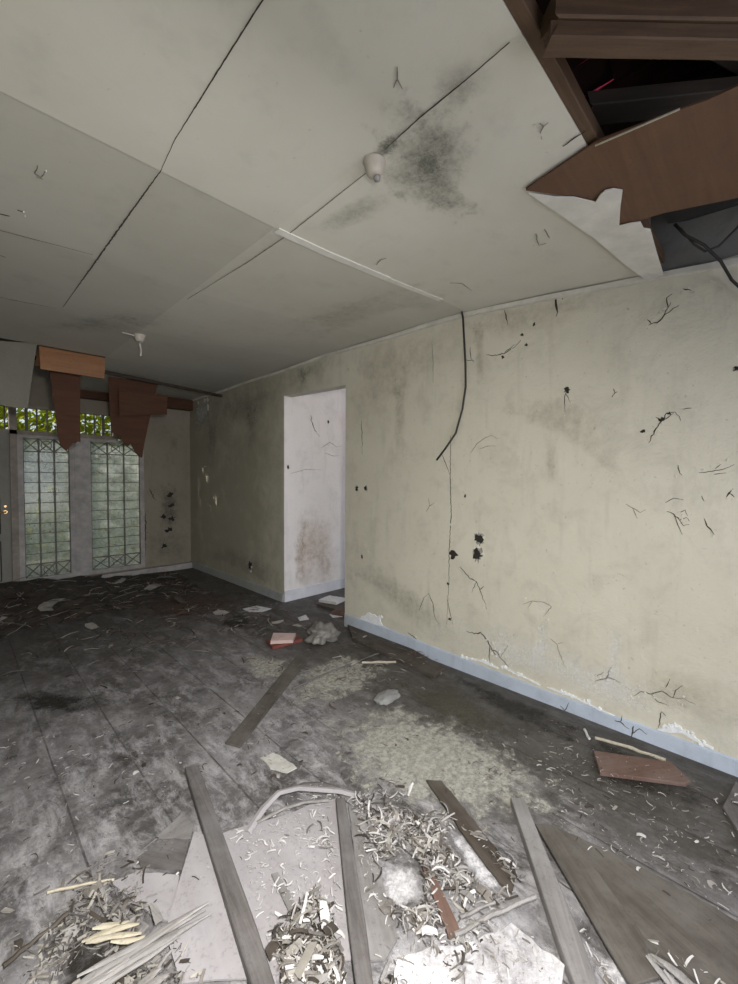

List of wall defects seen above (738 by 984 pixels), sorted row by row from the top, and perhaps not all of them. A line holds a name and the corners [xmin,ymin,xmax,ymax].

crack [467,298,563,362]
crack [647,288,690,329]
crack [640,408,688,442]
crack [626,459,734,537]
crack [406,435,508,665]
peeling [360,613,383,626]
crack [597,668,694,737]